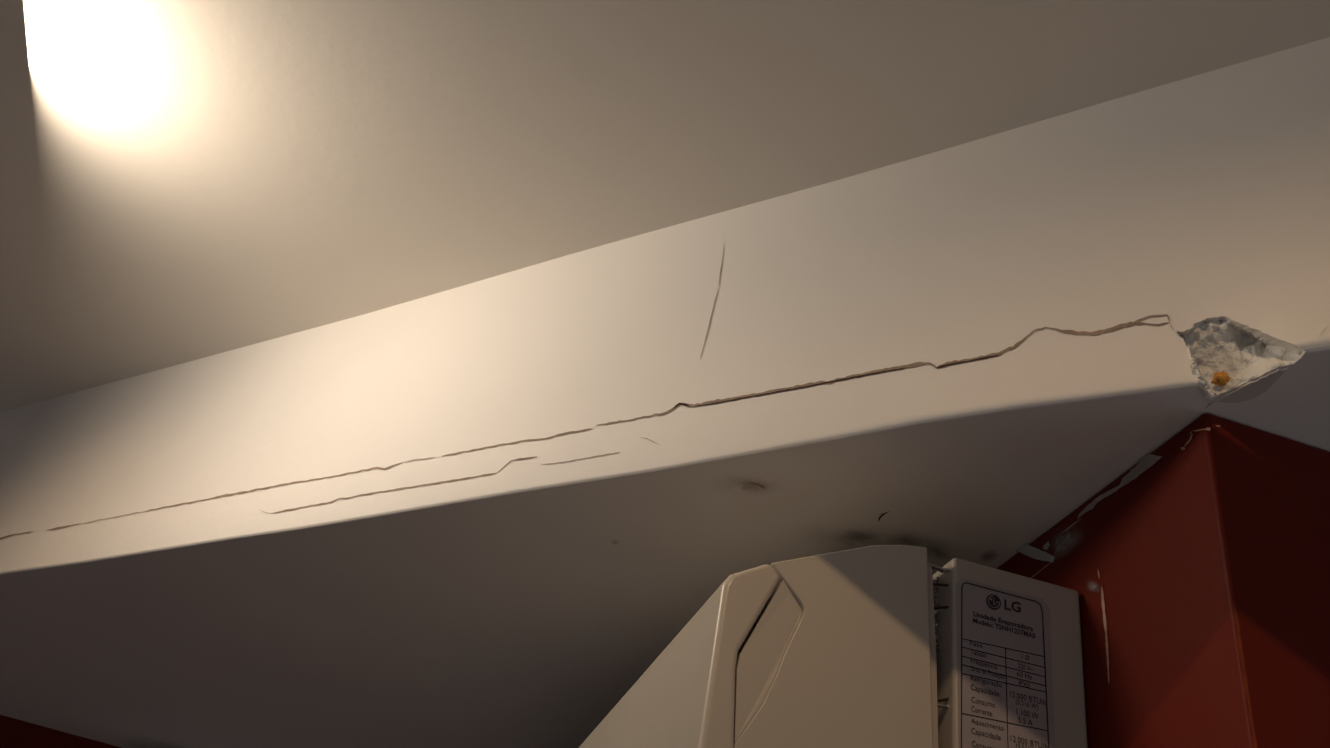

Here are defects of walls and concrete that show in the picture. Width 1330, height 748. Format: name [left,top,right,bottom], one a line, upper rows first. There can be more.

crack [700,246,724,358]
spalling [1174,316,1306,408]
crack [0,314,1174,540]